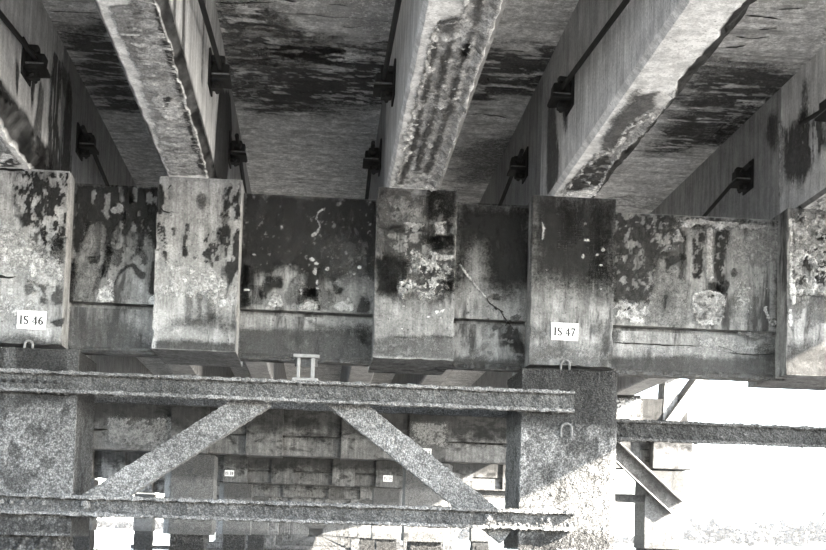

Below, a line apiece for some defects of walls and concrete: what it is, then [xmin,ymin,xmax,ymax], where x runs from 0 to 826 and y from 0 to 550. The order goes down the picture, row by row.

leakage [217,0,395,117]
leakage [0,21,826,381]
crack [486,296,515,331]
leakage [617,398,640,420]